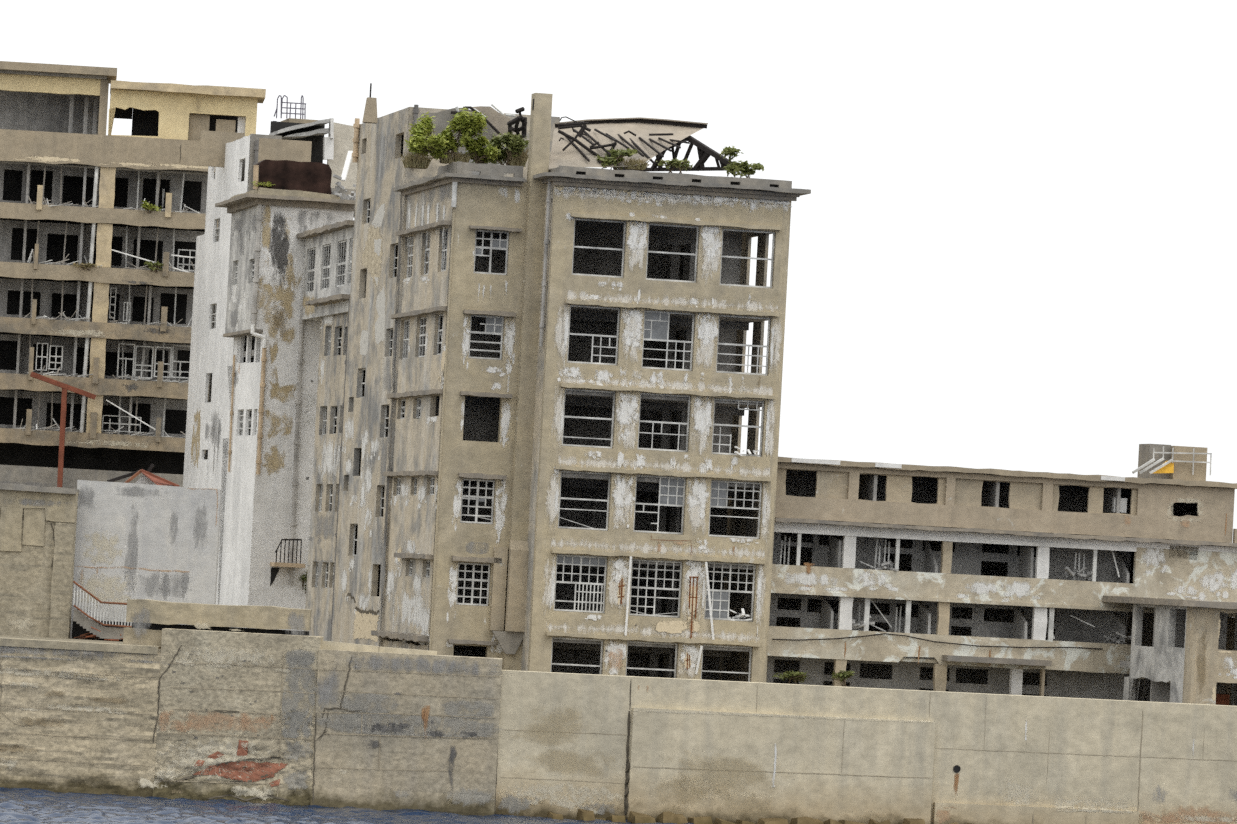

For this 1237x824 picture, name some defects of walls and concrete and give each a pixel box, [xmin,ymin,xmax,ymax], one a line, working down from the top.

peeling [564,187,672,255]
peeling [693,195,756,261]
peeling [621,290,643,347]
peeling [690,298,726,345]
peeling [557,315,664,528]
peeling [684,373,712,518]
water stain [128,533,188,595]
peeling [785,572,898,591]
crack [153,645,182,743]
crack [176,657,362,802]
peeling [140,770,182,793]
flaking render [193,735,307,803]